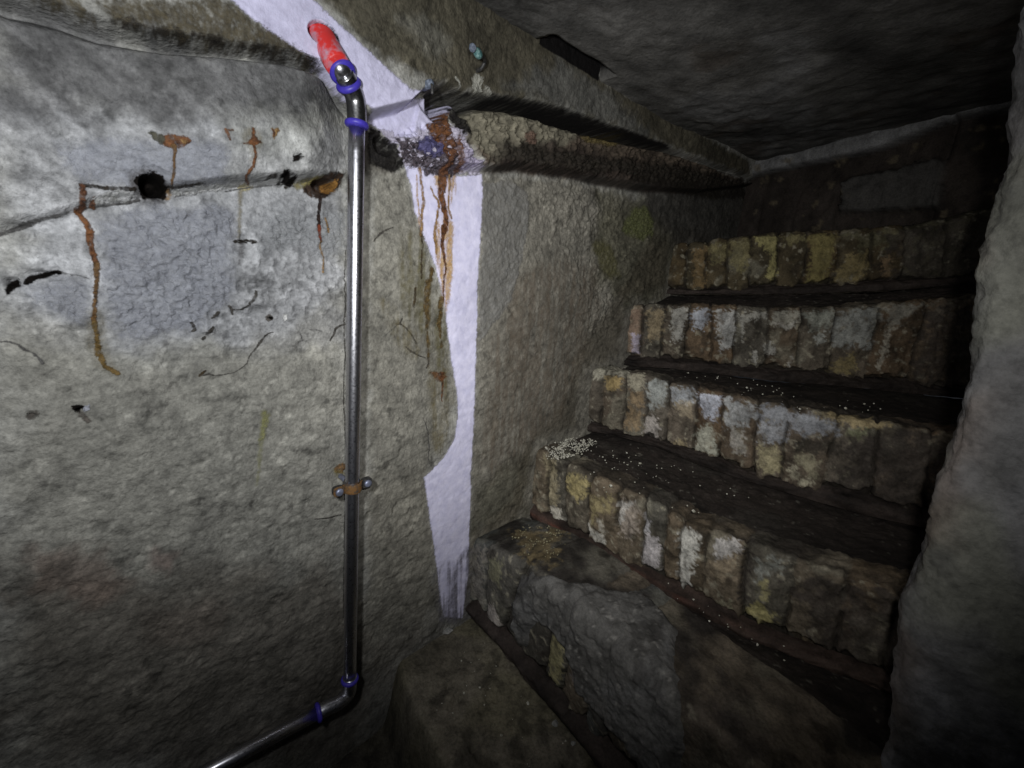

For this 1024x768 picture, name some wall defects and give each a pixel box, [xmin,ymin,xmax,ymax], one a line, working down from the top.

rust [148,131,191,186]
rust [243,127,279,185]
crack [0,183,140,236]
crack [166,182,294,192]
rust [396,113,483,304]
rust [73,184,120,375]
rust [430,372,446,400]